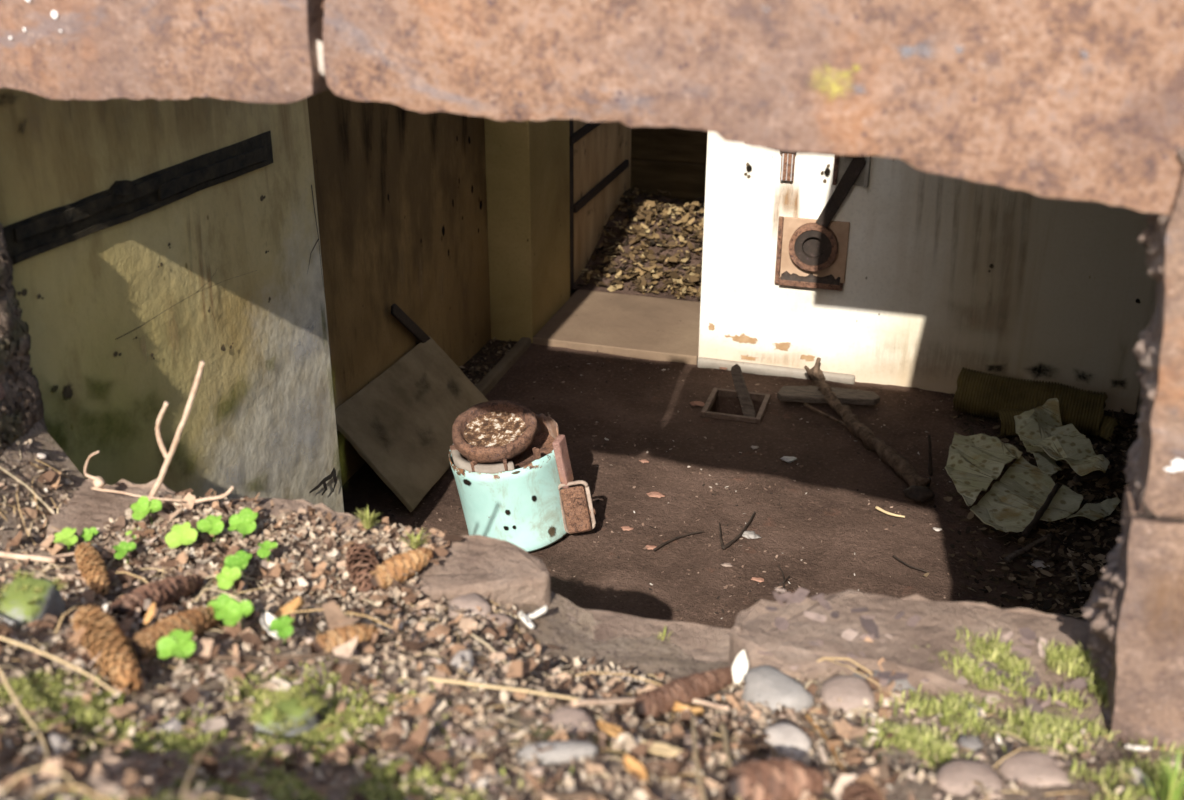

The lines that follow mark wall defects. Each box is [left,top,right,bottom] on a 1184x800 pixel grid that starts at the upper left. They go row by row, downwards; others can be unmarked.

peeling [708,323,758,360]
peeling [772,342,792,351]